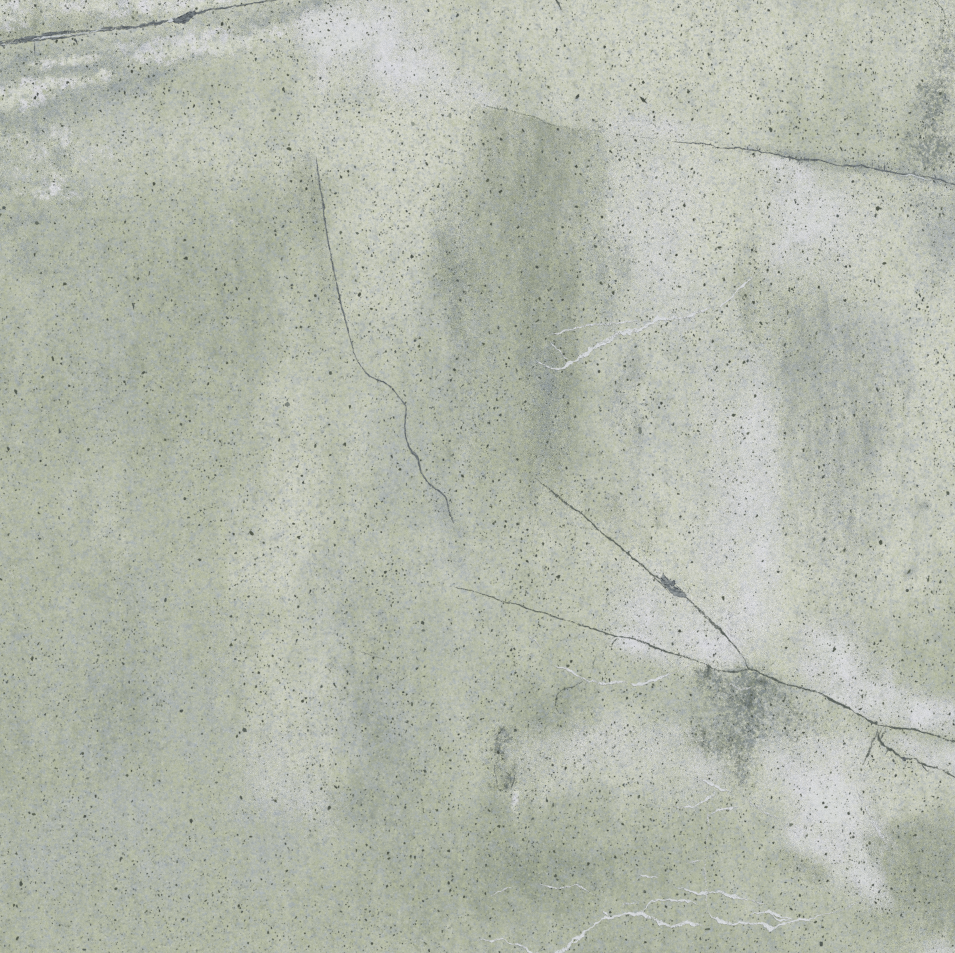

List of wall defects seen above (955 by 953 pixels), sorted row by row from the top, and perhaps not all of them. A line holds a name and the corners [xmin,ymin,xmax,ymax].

crack [0,0,275,51]
crack [623,134,955,192]
crack [316,157,458,523]
crack [456,481,955,778]